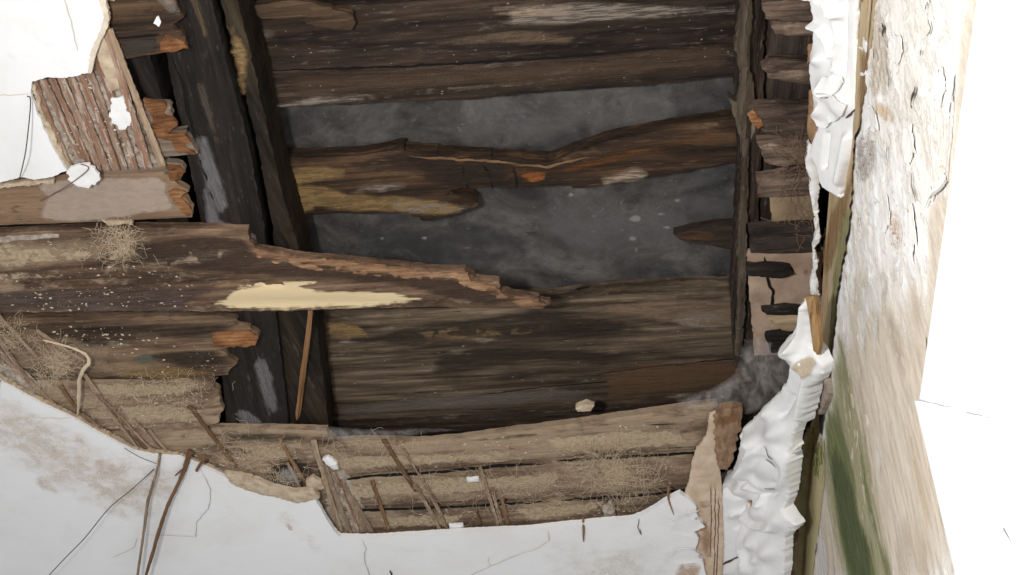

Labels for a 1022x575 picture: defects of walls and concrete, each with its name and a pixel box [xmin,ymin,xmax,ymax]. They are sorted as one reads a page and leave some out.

flaking render [88,0,111,73]
peeling [509,3,689,24]
flaking render [0,176,55,189]
peeling [902,0,977,349]
flaking render [820,184,829,257]
peeling [215,281,421,310]
flaking render [0,373,320,503]
damp [802,281,946,575]
crack [162,473,211,537]
flaking render [667,411,724,575]
flaking render [791,418,815,575]
crack [472,532,550,575]